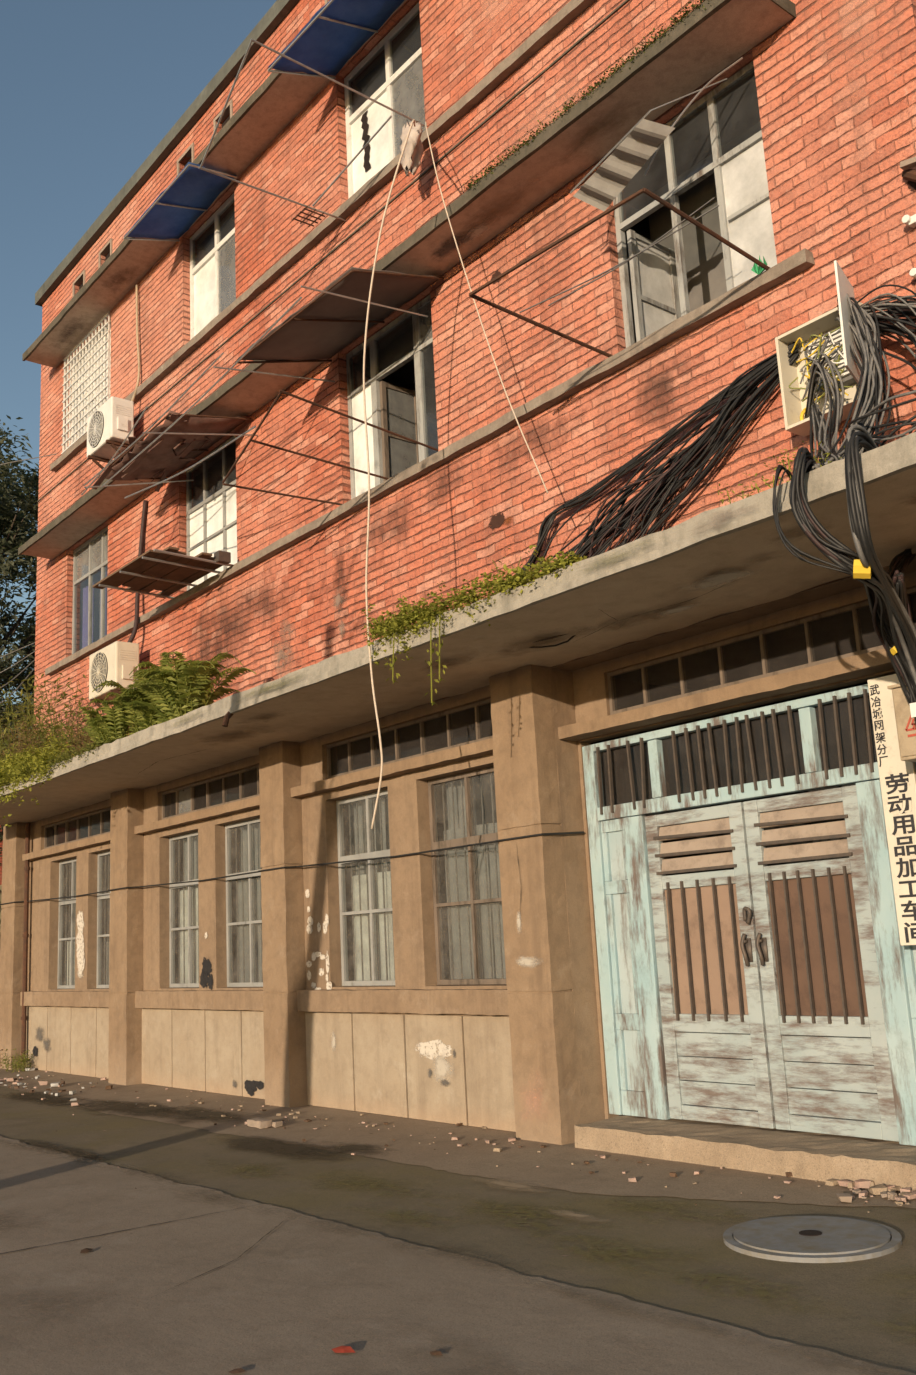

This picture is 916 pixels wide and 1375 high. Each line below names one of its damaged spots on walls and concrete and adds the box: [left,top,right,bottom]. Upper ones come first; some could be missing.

peeling [305,889,329,934]
peeling [306,951,332,990]